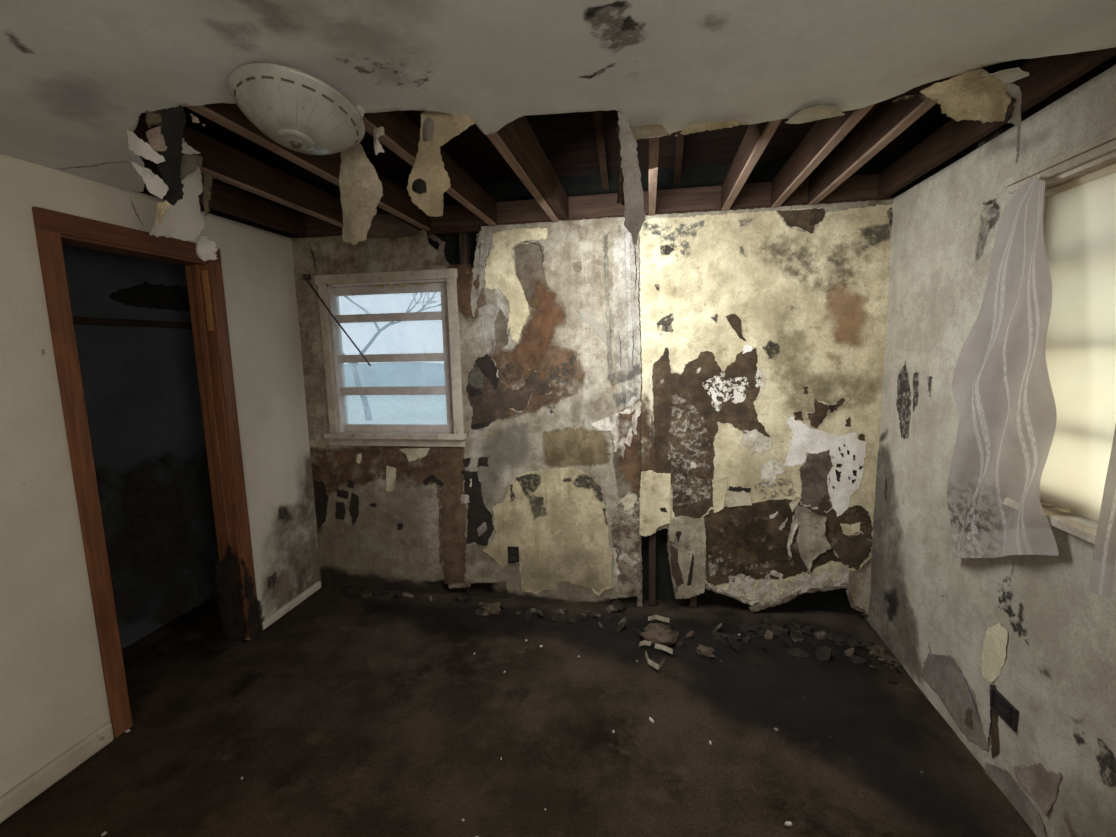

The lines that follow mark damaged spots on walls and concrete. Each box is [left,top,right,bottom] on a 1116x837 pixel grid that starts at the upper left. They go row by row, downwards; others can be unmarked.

mould [585,1,645,49]
mould [644,221,705,255]
peeling [777,207,827,234]
leakage [769,208,893,287]
flaking render [466,227,552,430]
corrosion [505,283,565,379]
leakage [657,313,674,332]
flaking render [591,226,873,615]
peeling [313,479,377,528]
flaking render [461,456,494,547]
leakage [95,434,988,837]
peeling [921,622,1061,837]